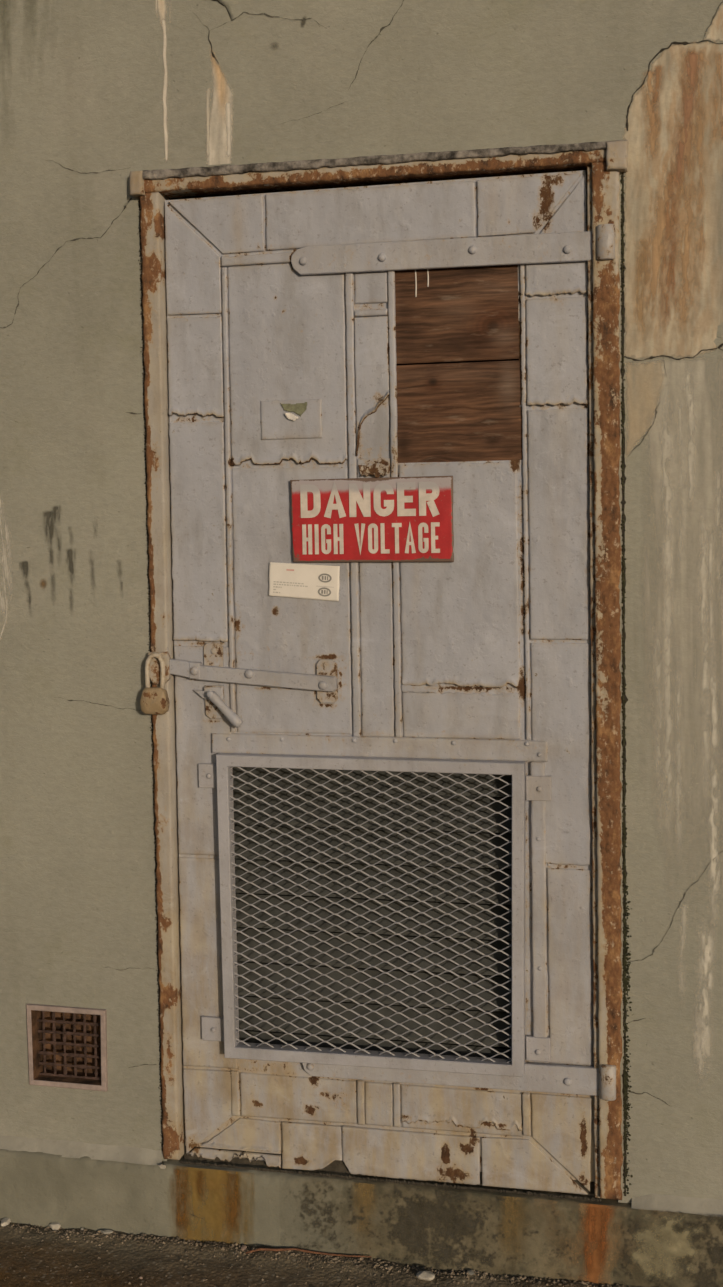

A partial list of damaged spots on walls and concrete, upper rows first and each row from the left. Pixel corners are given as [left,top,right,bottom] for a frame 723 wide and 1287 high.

damp [155,0,168,161]
damp [206,56,233,165]
crack [199,0,324,62]
crack [626,1,723,131]
crack [0,160,131,328]
crack [624,322,723,461]
damp [50,539,74,574]
damp [644,359,723,1072]
crack [632,851,722,962]
rust [176,1167,247,1244]
damp [296,1186,516,1271]
rust [574,1203,614,1284]